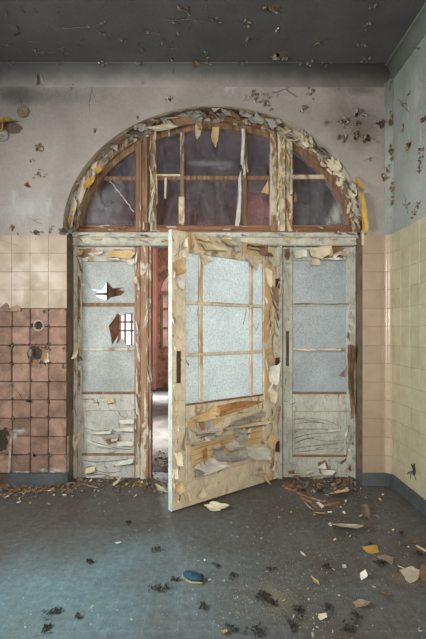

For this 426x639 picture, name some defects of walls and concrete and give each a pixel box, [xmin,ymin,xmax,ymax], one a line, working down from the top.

peeling [337,107,394,143]
peeling [381,144,395,206]
spalling [0,90,369,503]